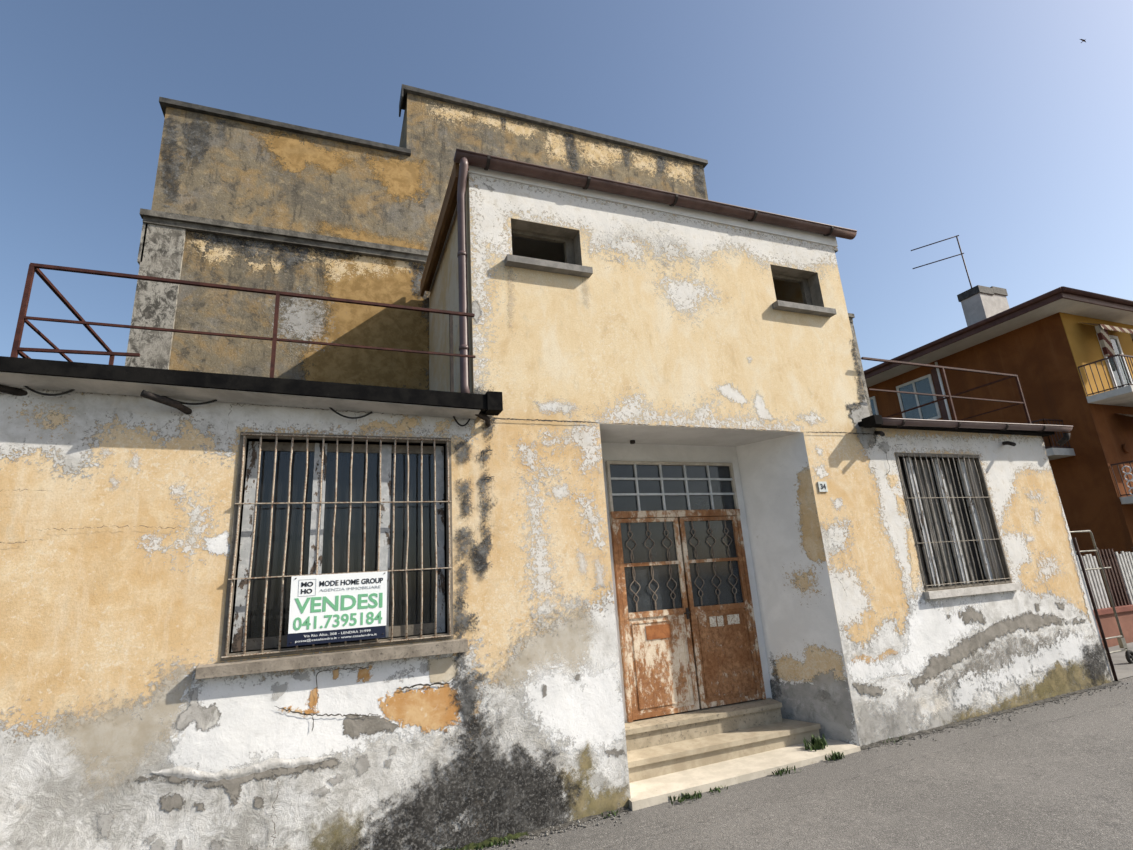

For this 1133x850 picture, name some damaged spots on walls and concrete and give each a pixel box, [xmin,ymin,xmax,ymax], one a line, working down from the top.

peeling [469,173,838,394]
water stain [58,666,196,786]
peeling [0,382,826,850]
water stain [313,415,631,850]
peeling [770,394,1113,745]
water stain [856,621,1111,746]